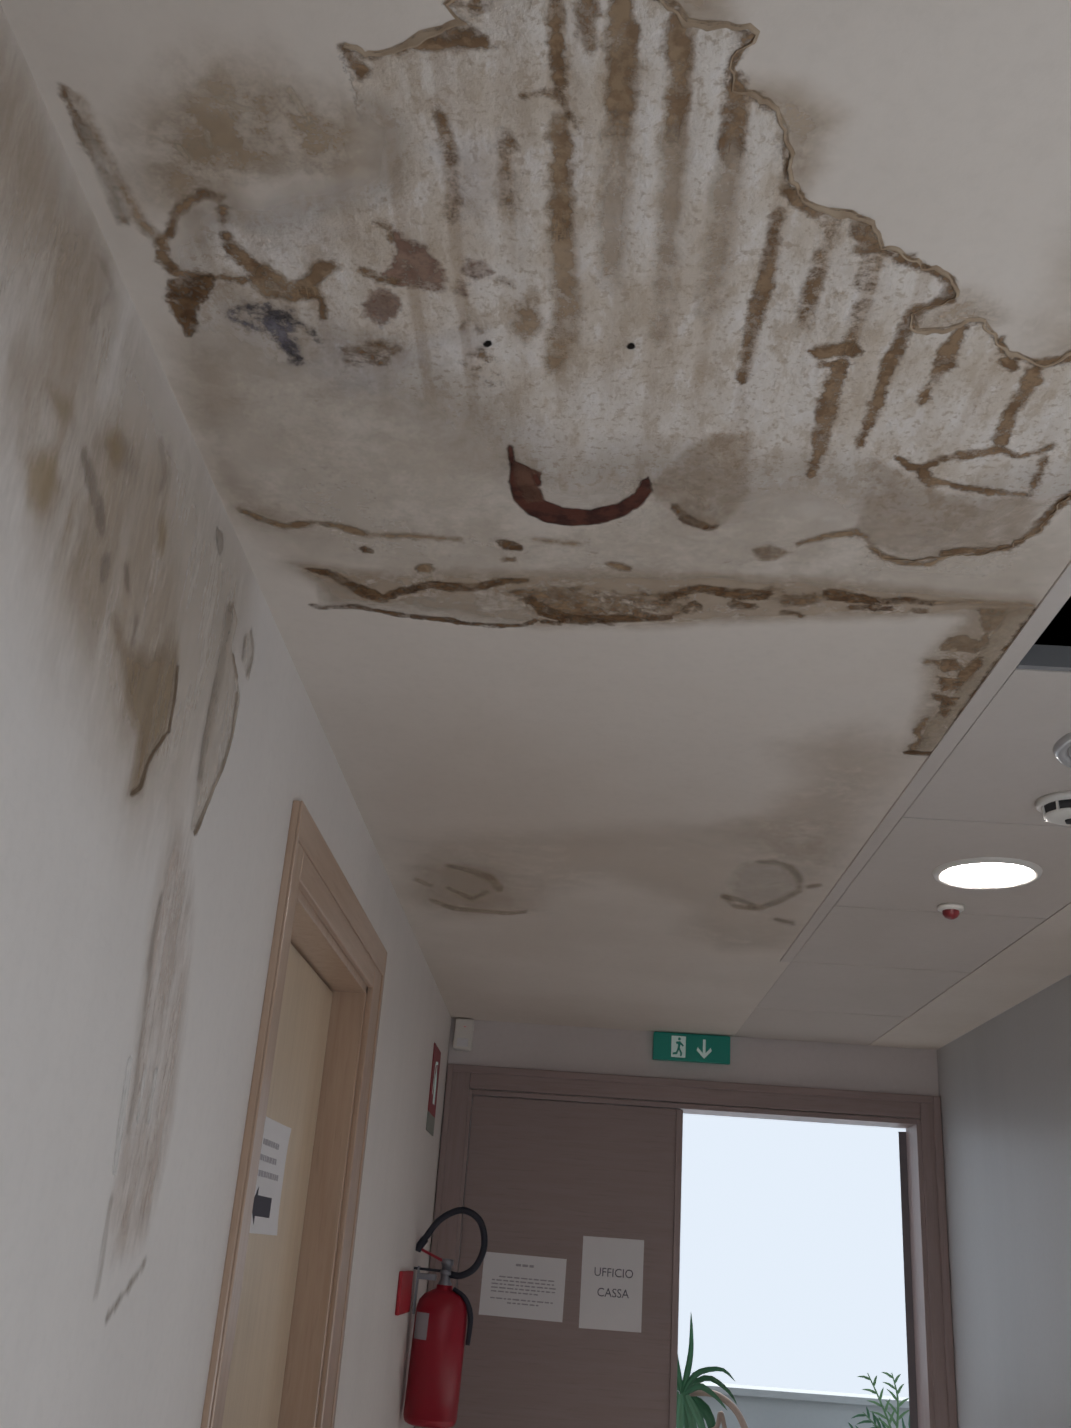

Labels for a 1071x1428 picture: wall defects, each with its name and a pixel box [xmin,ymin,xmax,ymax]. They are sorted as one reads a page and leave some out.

damp [162,76,350,195]
mould [228,303,316,366]
flaking render [155,0,1071,566]
rust [507,445,653,526]
damp [672,505,717,531]
peeling [304,568,1035,756]
damp [126,657,179,796]